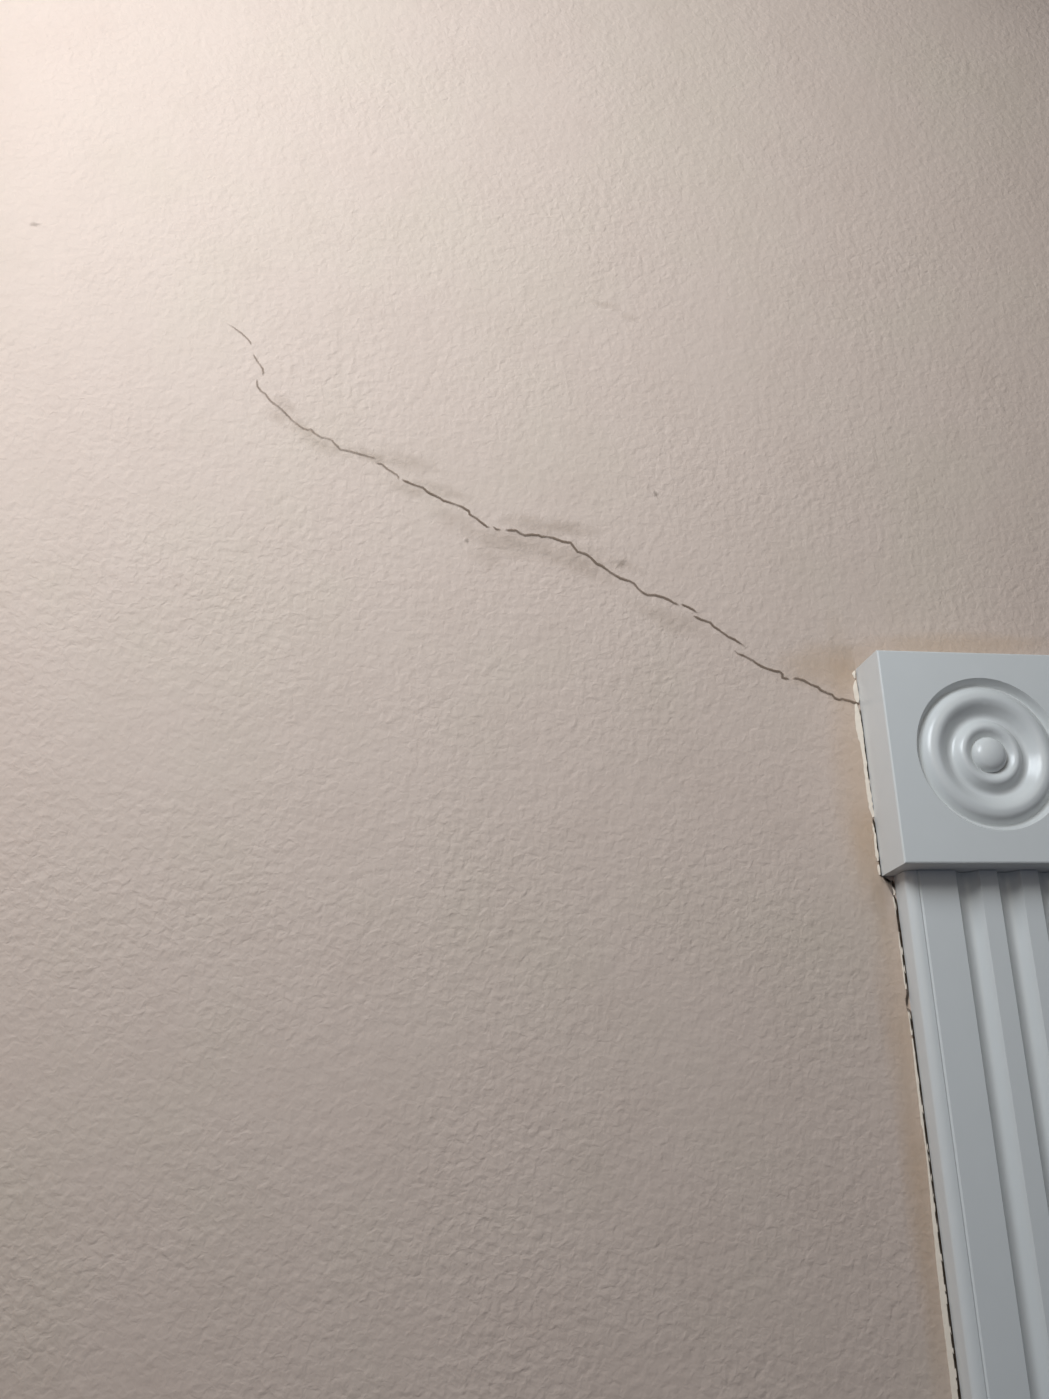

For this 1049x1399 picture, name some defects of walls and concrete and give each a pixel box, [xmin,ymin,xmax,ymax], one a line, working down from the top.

crack [235,328,961,1399]